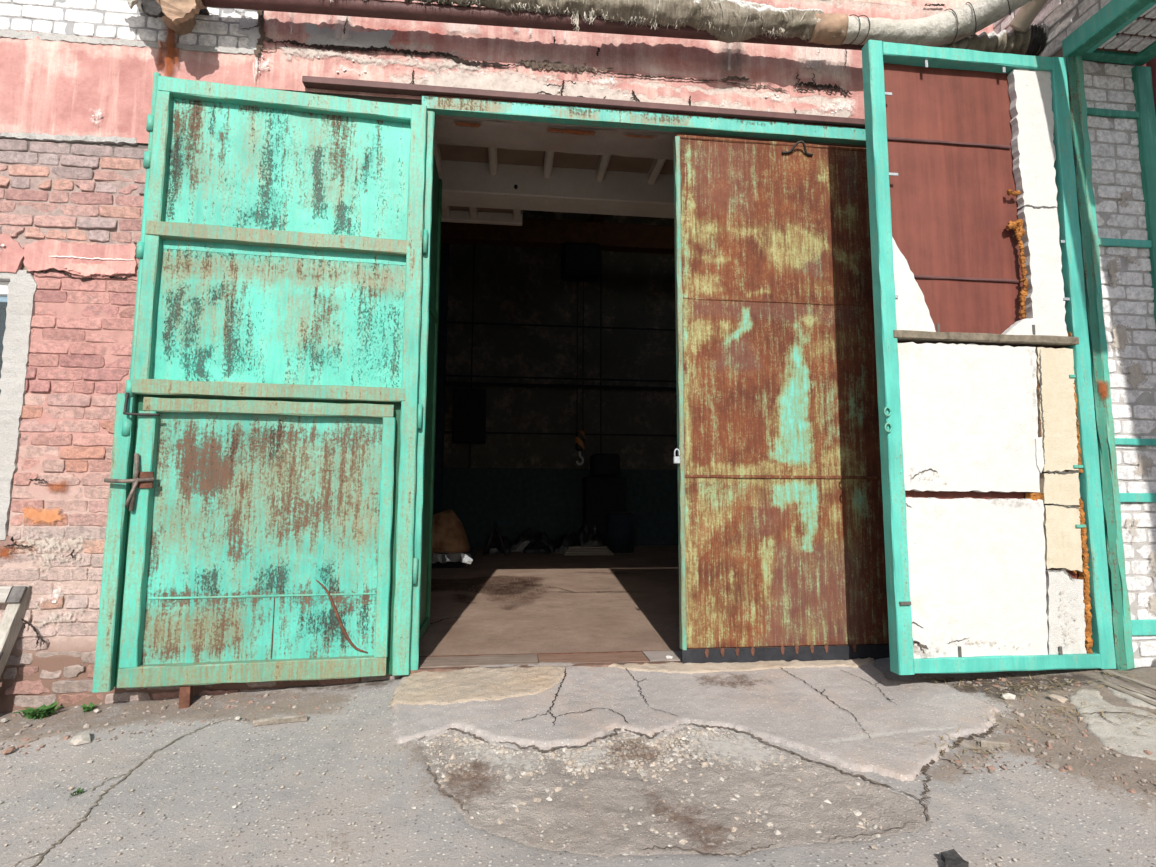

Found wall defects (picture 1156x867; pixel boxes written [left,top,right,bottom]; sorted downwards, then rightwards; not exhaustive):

corrosion [158,28,178,76]
crack [242,10,852,114]
crack [517,668,679,725]
crack [12,719,233,867]